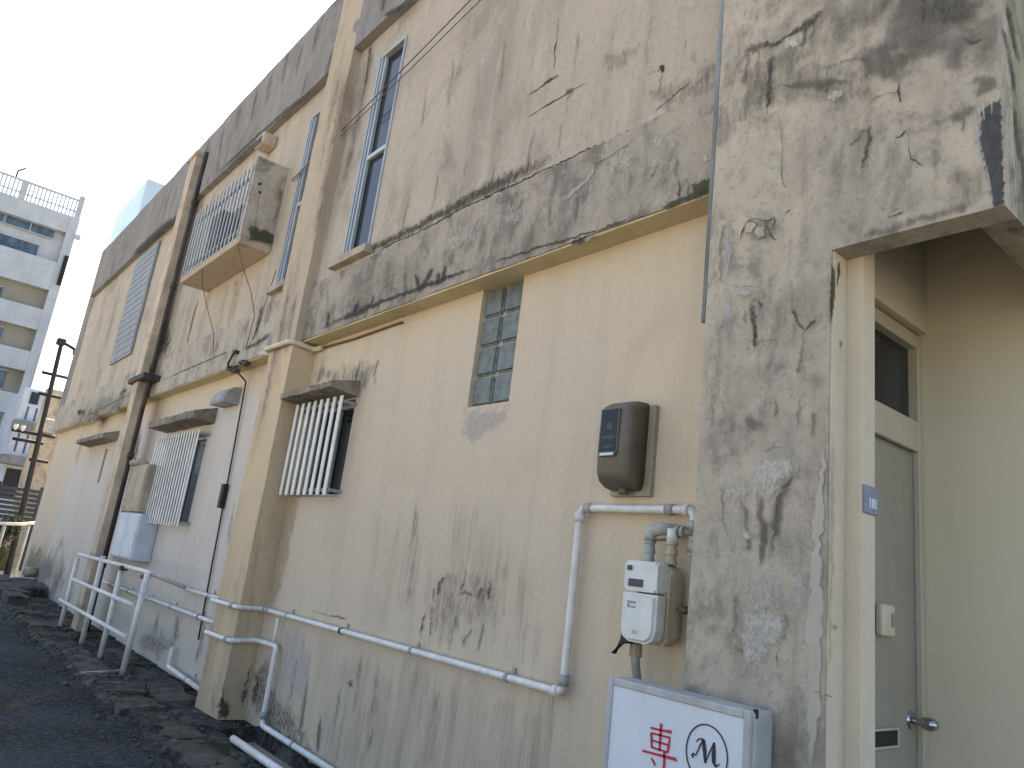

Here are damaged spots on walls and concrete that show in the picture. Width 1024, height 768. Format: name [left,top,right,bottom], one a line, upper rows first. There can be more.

crack [531,18,586,115]
crack [360,126,638,259]
peeling [975,99,1005,206]
water stain [324,267,469,327]
peeling [742,577,788,665]